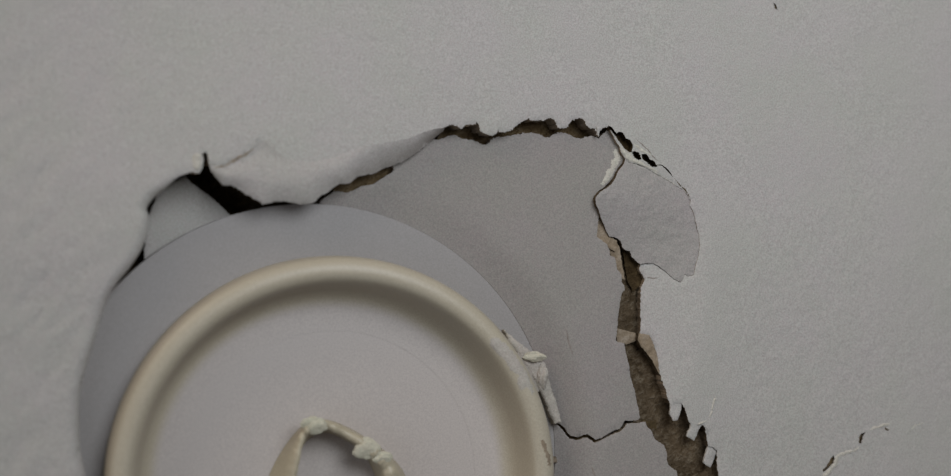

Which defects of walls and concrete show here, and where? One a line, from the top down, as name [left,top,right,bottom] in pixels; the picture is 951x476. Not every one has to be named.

peeling [593,159,700,282]
crack [557,219,716,476]
crack [823,423,923,476]